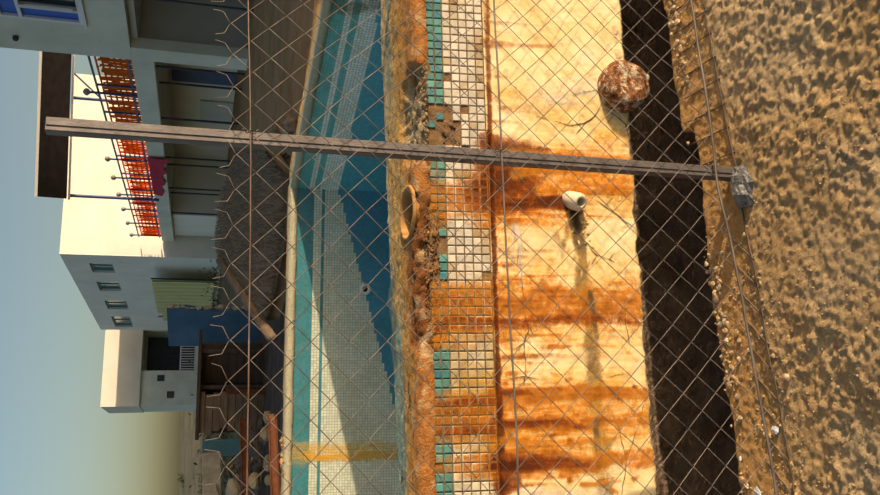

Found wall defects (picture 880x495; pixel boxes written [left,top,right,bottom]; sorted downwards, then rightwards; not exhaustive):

rust [475,0,630,160]
spalling [423,199,442,352]
rust [430,164,654,495]
rust [291,441,398,464]